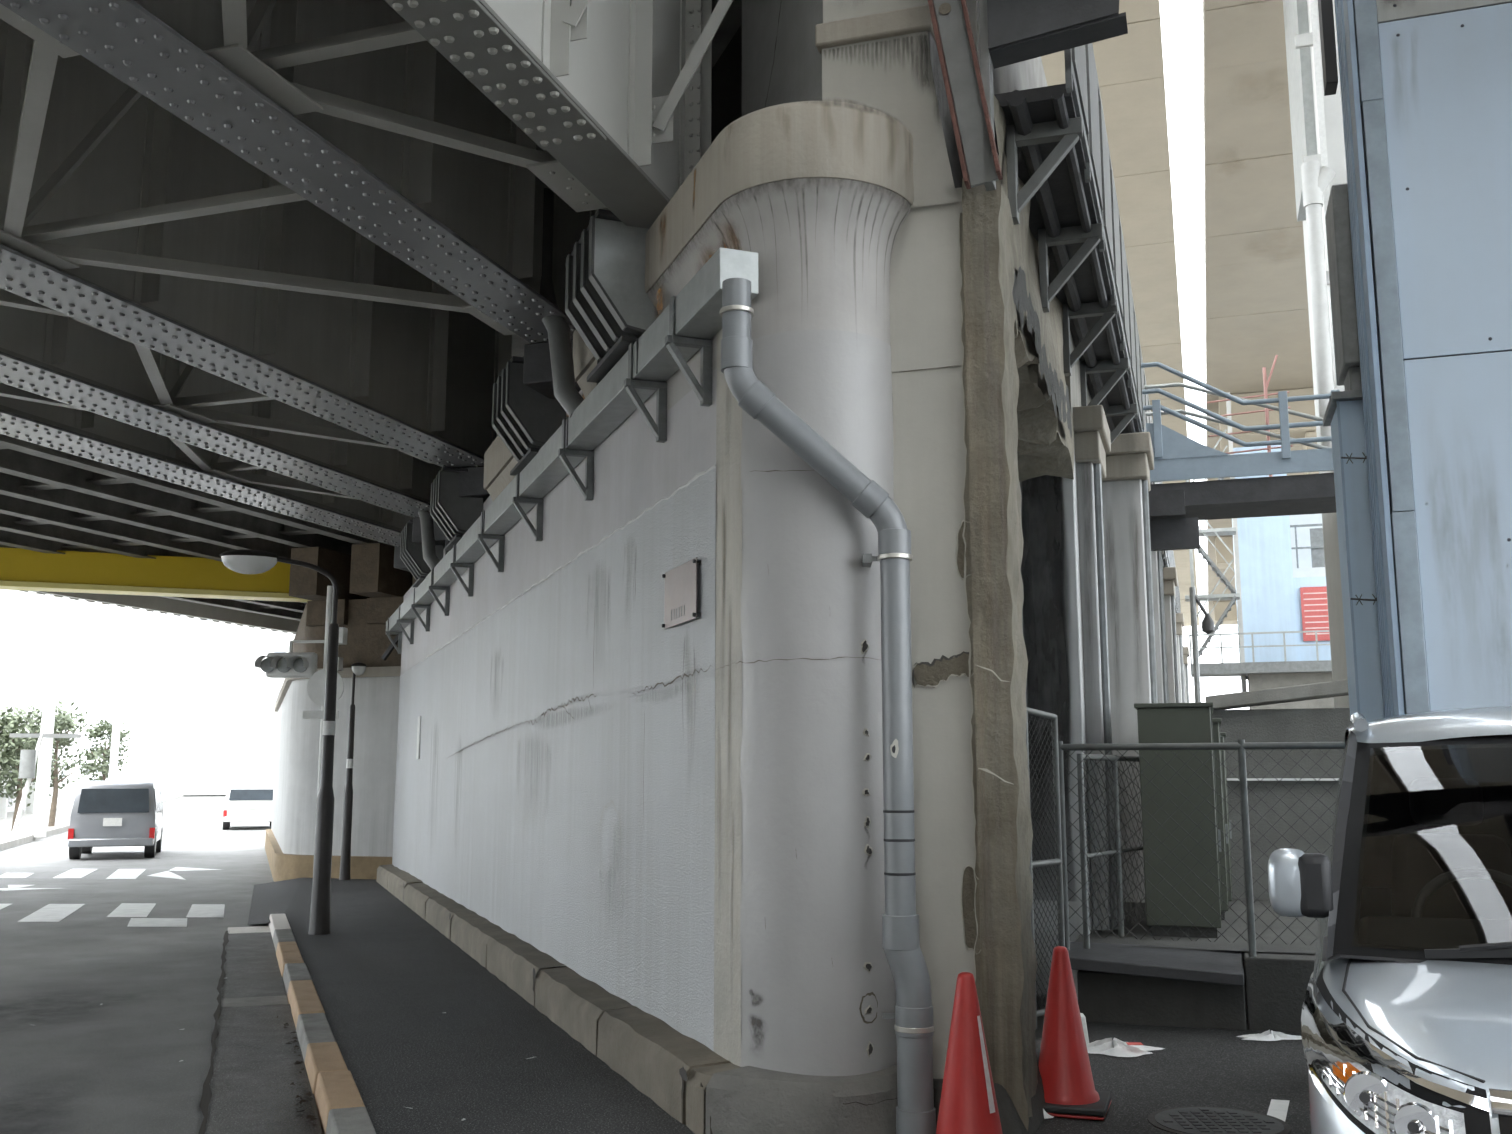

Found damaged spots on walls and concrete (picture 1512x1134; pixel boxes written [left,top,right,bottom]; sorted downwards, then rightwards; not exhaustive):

crack [447,617,878,759]
peeling [912,213,982,1017]